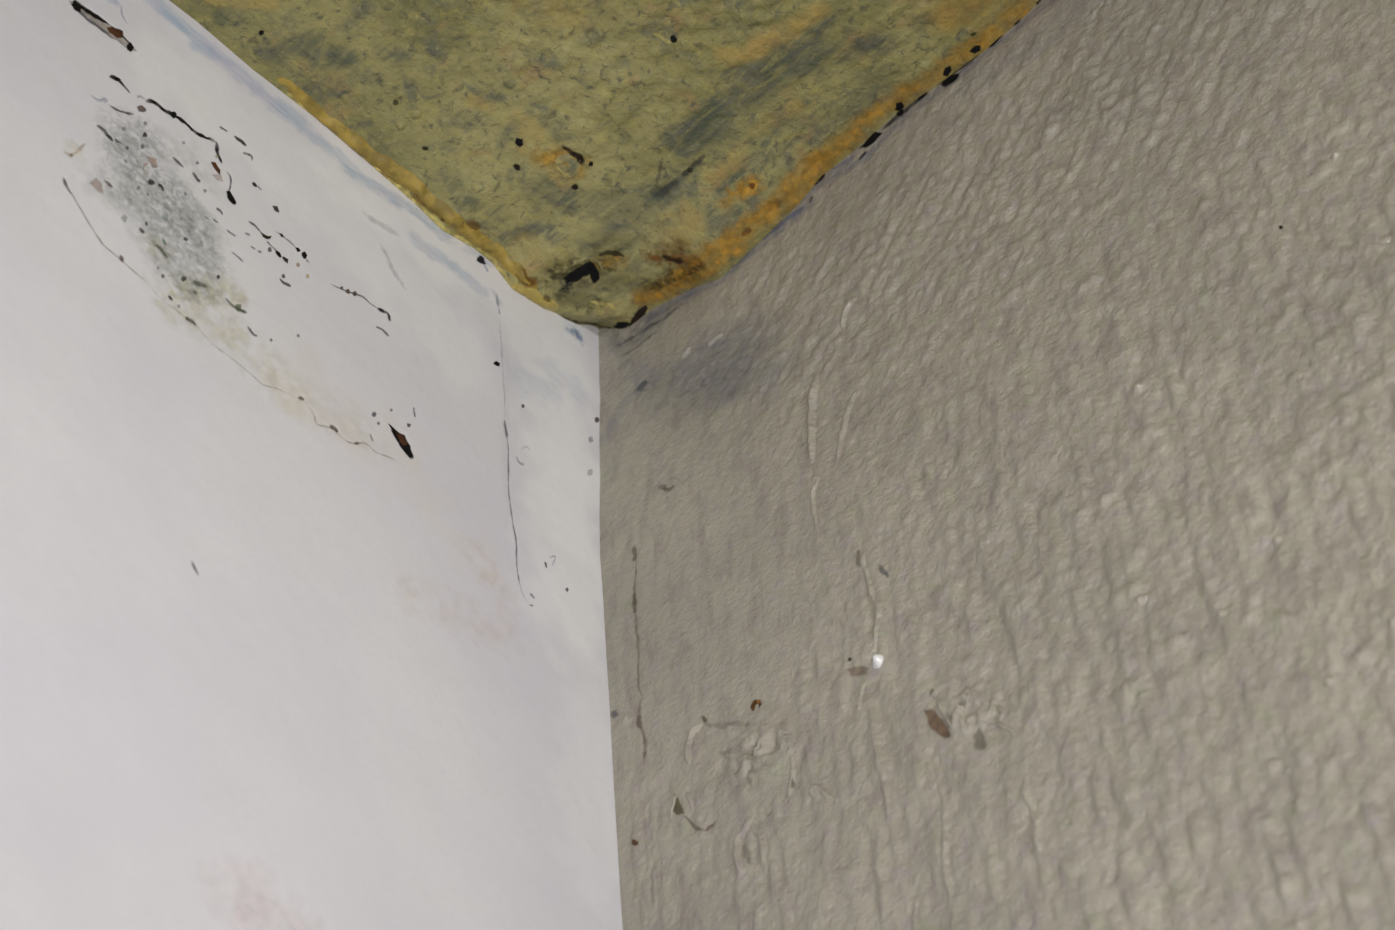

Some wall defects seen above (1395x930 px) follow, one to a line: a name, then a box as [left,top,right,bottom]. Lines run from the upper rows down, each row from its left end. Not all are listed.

crack [513,527,534,606]